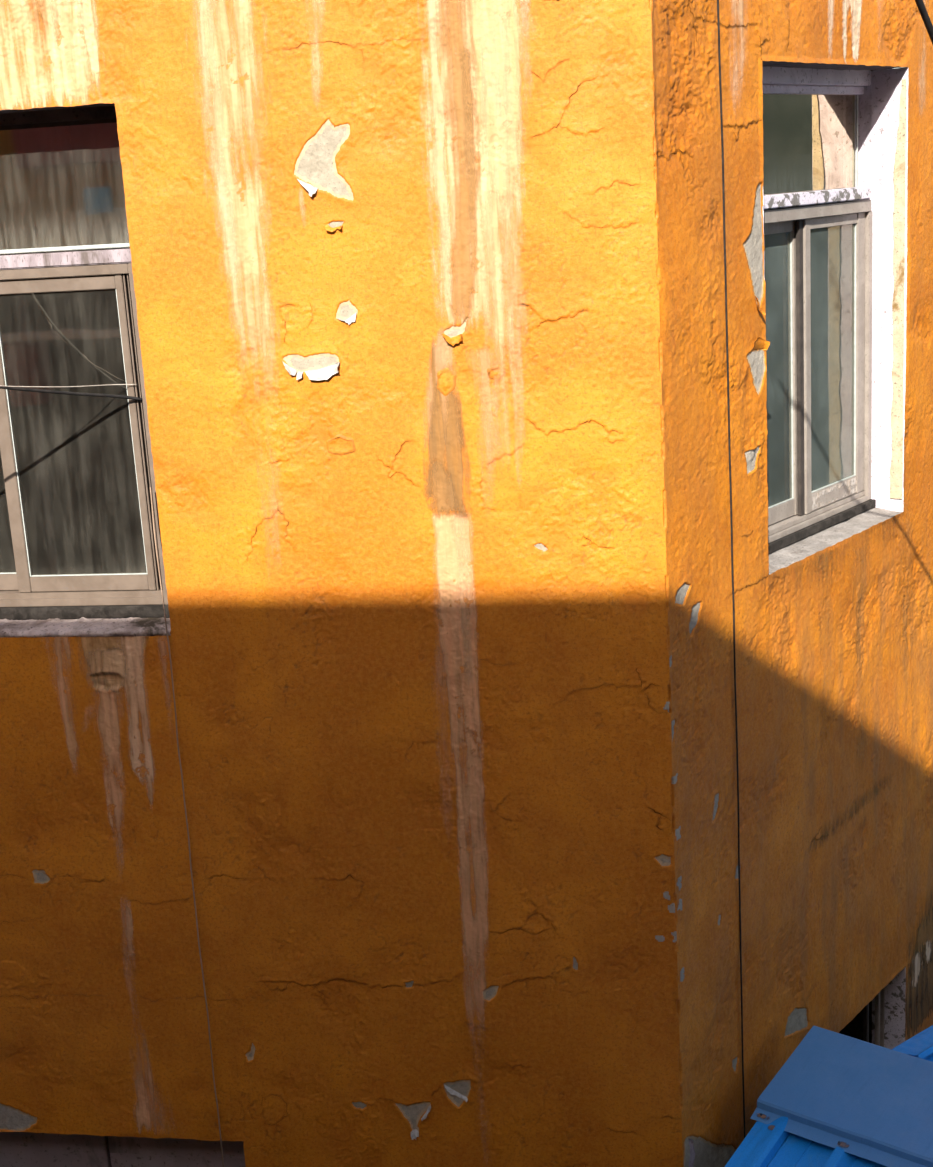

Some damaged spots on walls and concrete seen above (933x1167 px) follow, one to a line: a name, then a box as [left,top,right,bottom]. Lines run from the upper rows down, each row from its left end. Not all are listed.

leakage [0,0,99,110]
leakage [829,0,861,62]
peeling [294,119,354,201]
leakage [424,0,529,458]
peeling [743,183,766,315]
peeling [336,300,358,325]
peeling [282,353,340,381]
peeling [747,337,770,395]
peeling [675,583,700,634]
leakage [426,333,488,1025]
leakage [54,636,169,847]
peeling [684,1136,736,1167]